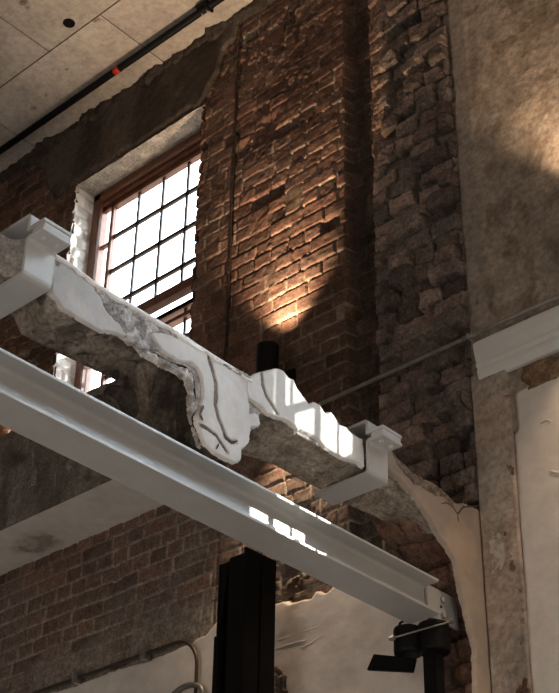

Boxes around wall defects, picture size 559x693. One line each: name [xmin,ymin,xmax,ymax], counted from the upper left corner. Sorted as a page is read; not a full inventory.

spalling [93,286,202,449]
crack [260,372,277,413]
spalling [392,454,454,508]